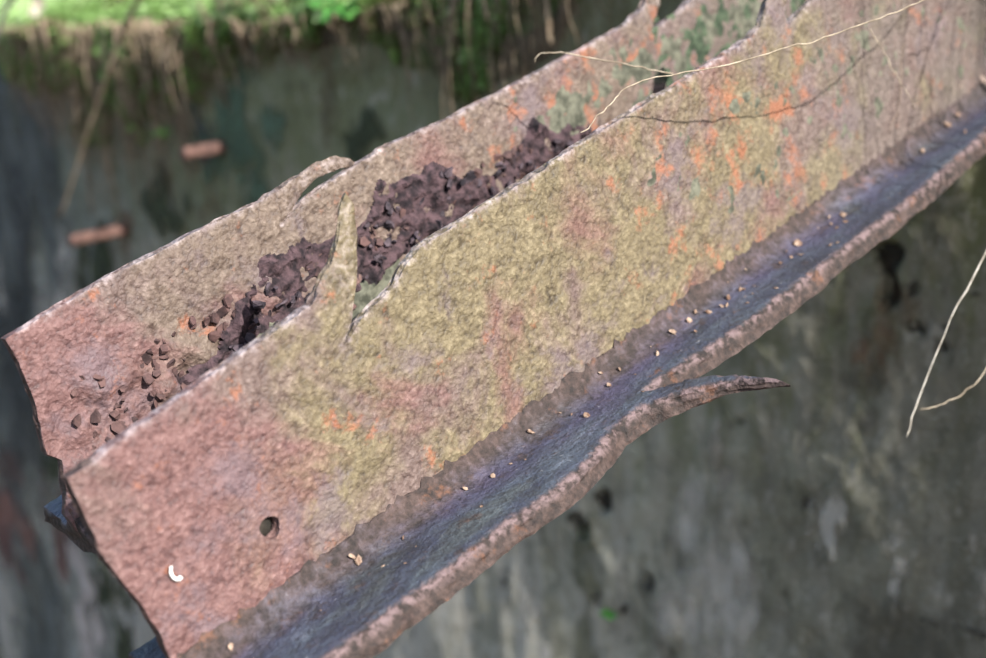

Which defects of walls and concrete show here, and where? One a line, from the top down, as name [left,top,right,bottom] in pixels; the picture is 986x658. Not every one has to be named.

corrosion [355,117,592,292]
damp [0,75,67,512]
corrosion [176,236,335,385]
damp [0,530,61,658]
damp [67,540,104,658]